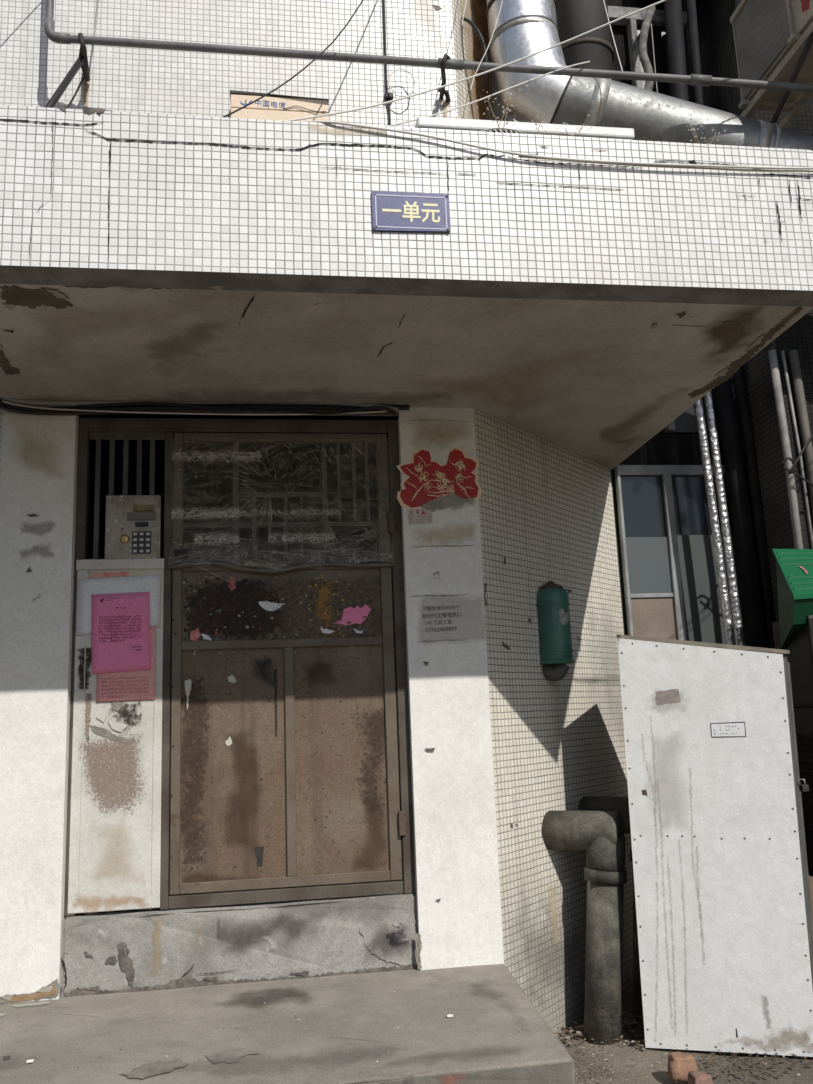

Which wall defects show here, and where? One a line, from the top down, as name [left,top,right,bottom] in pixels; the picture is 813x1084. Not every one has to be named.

corrosion [462,0,492,120]
crack [0,97,812,260]
water stain [709,310,756,353]
spalling [0,916,422,1003]
spalling [118,1058,189,1079]